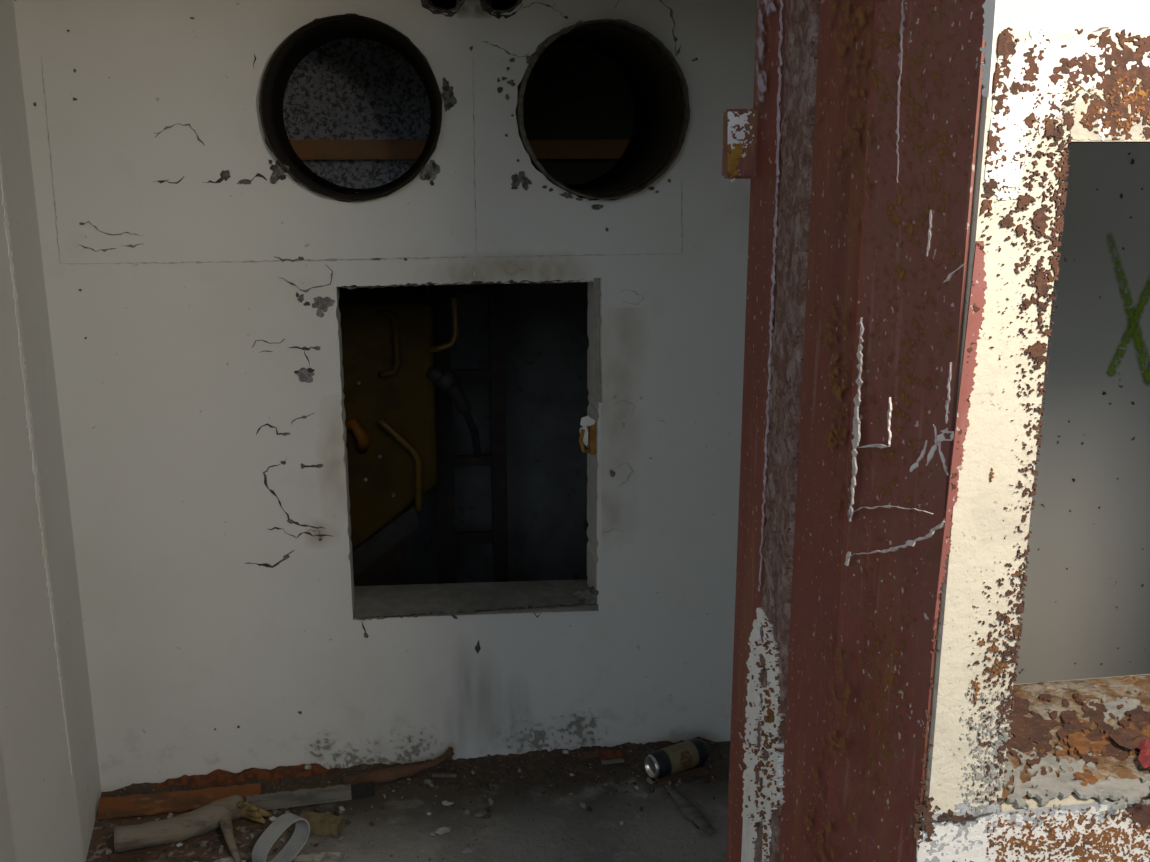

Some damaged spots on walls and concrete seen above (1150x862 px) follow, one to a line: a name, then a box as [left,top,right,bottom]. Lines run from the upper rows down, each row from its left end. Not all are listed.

crack [659,0,681,56]
spalling [497,20,582,100]
spalling [441,77,457,112]
crack [41,41,683,293]
spalling [420,160,440,186]
crack [252,339,321,365]
rust [912,27,1150,862]
crack [245,413,331,568]
rust [155,763,345,788]